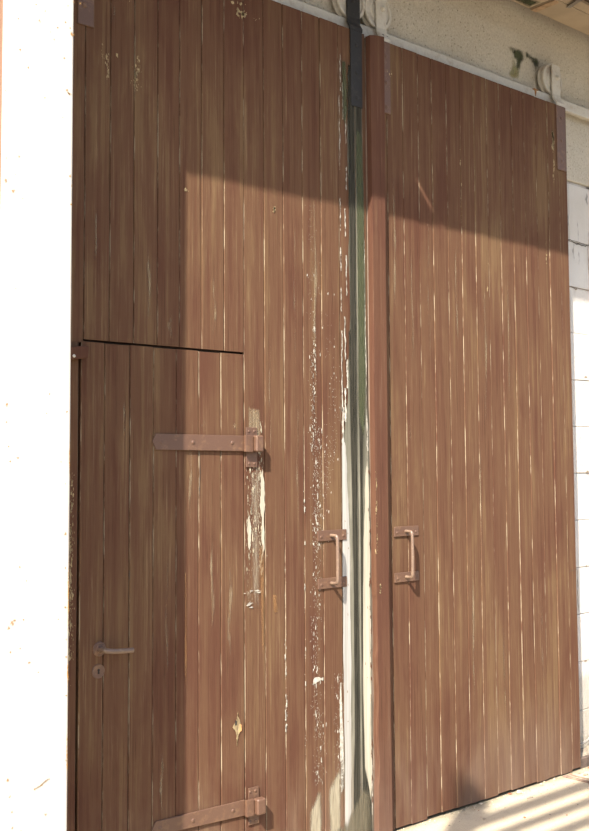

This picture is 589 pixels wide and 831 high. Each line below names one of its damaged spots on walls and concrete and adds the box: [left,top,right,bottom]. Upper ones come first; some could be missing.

peeling [245,452,265,575]
peeling [303,247,382,831]